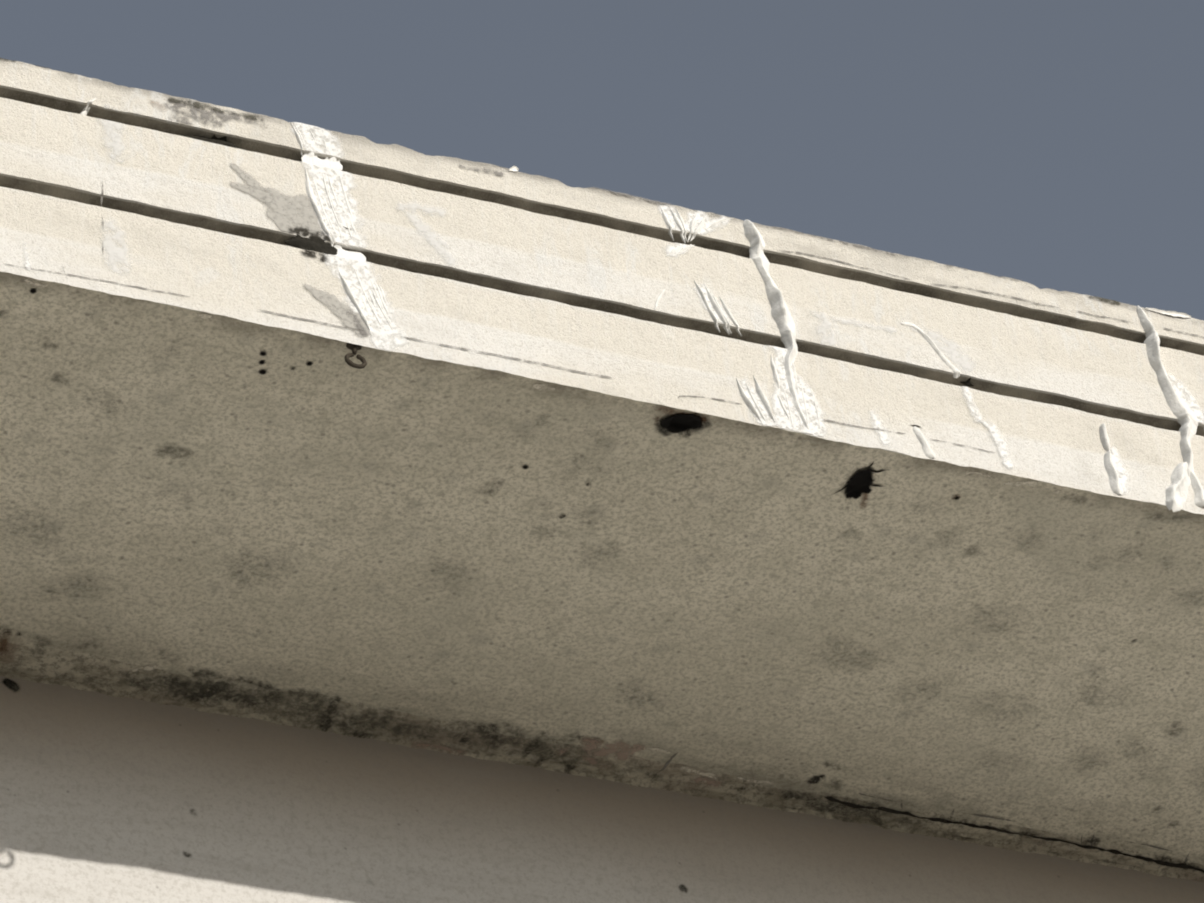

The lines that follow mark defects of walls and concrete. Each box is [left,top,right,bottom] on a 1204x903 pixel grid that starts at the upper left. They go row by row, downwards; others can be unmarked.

crack [3,180,189,297]
crack [260,310,361,331]
crack [404,337,612,378]
crack [815,418,995,453]
water stain [133,665,581,774]
water stain [785,763,876,821]
crack [825,793,1204,873]